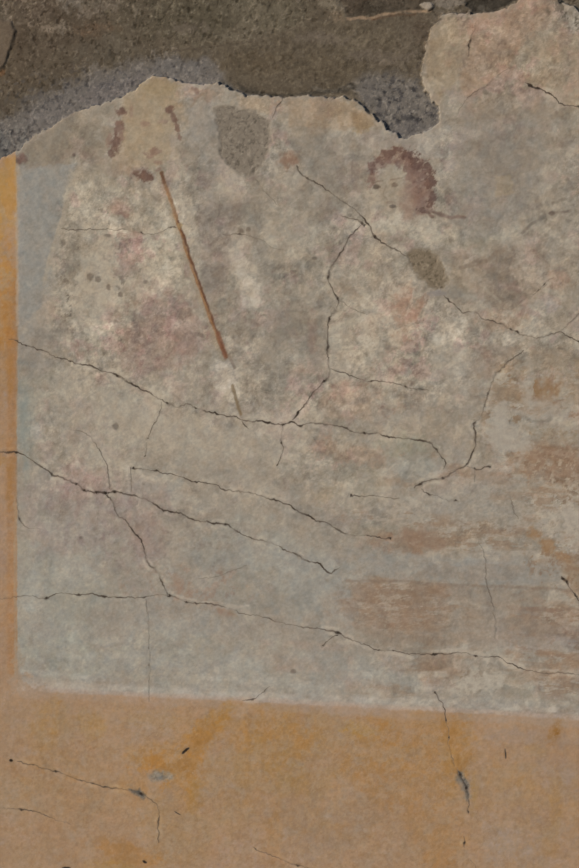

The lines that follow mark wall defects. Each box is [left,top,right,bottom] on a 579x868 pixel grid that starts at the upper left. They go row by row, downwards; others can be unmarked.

flaking render [0,0,518,160]
spalling [216,106,305,177]
crack [0,165,579,702]
crack [0,807,71,825]
crack [17,761,160,843]
crack [434,691,470,815]